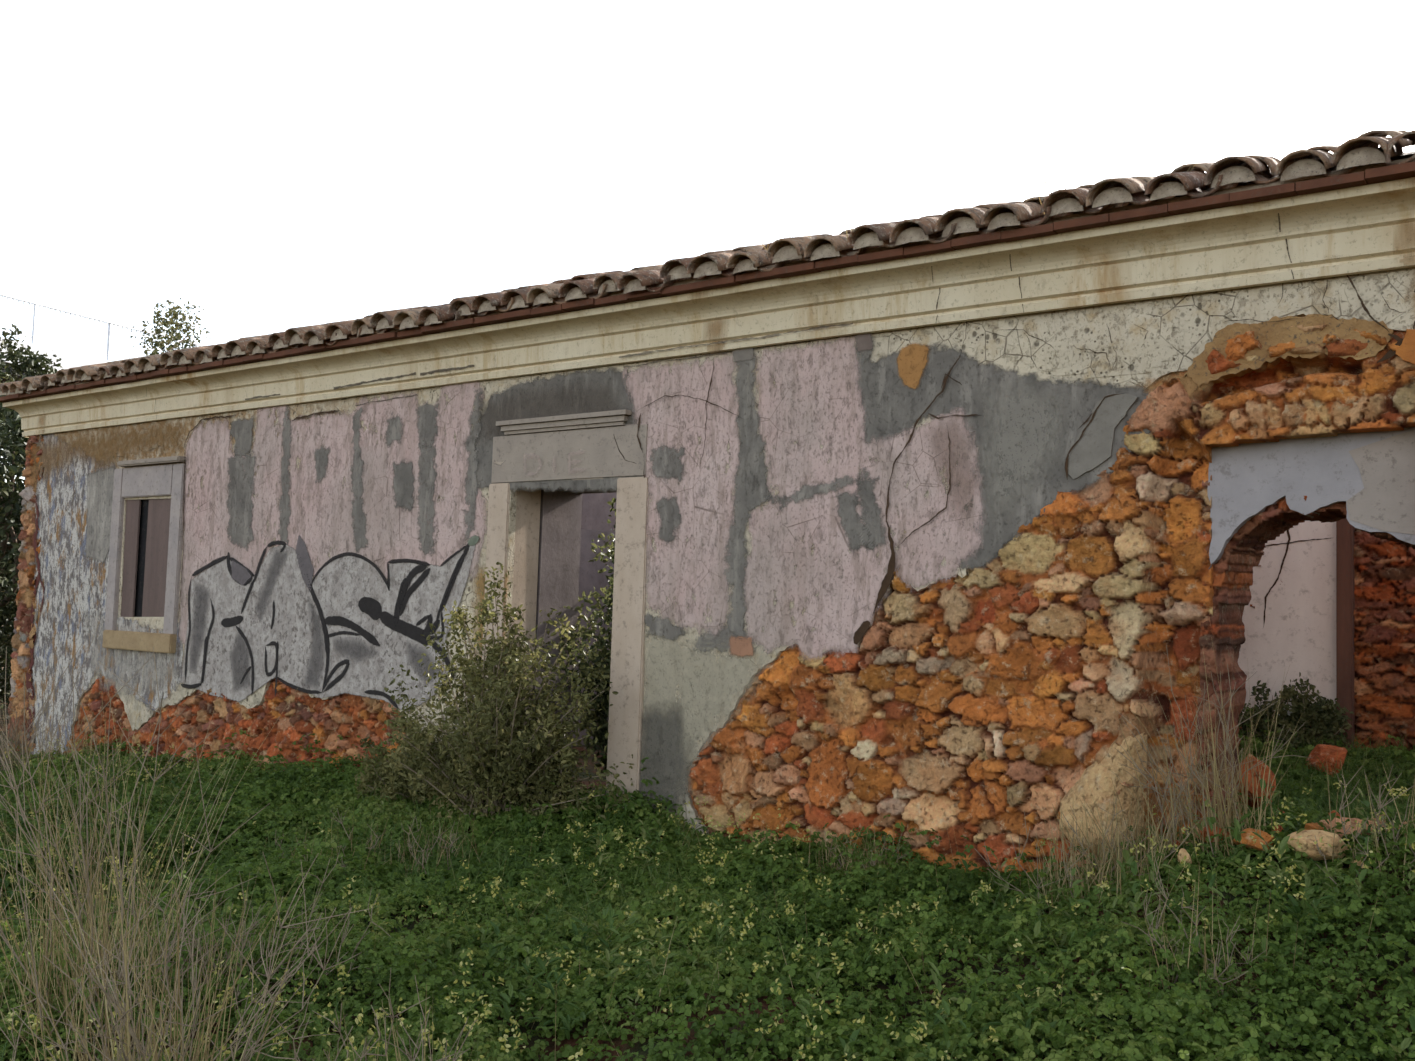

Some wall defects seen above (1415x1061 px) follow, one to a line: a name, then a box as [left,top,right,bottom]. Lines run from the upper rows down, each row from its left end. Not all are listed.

peeling [5,434,411,774]
flaking render [897,343,929,389]
crack [853,255,1146,645]
crack [1225,213,1415,363]